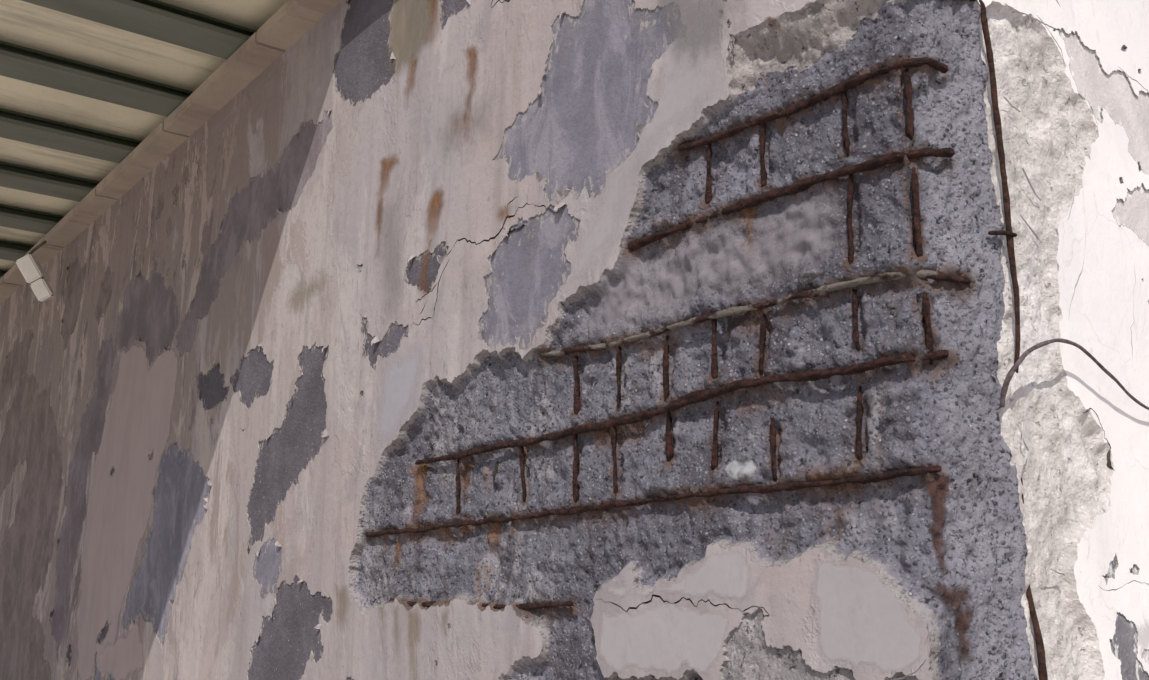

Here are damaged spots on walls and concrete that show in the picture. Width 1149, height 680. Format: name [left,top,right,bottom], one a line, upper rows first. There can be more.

rust [382,159,394,183]
rust [429,191,442,222]
crack [412,198,559,325]
peeling [0,0,396,680]
spalling [348,0,1149,680]
rust [928,476,949,569]
crack [602,594,769,614]